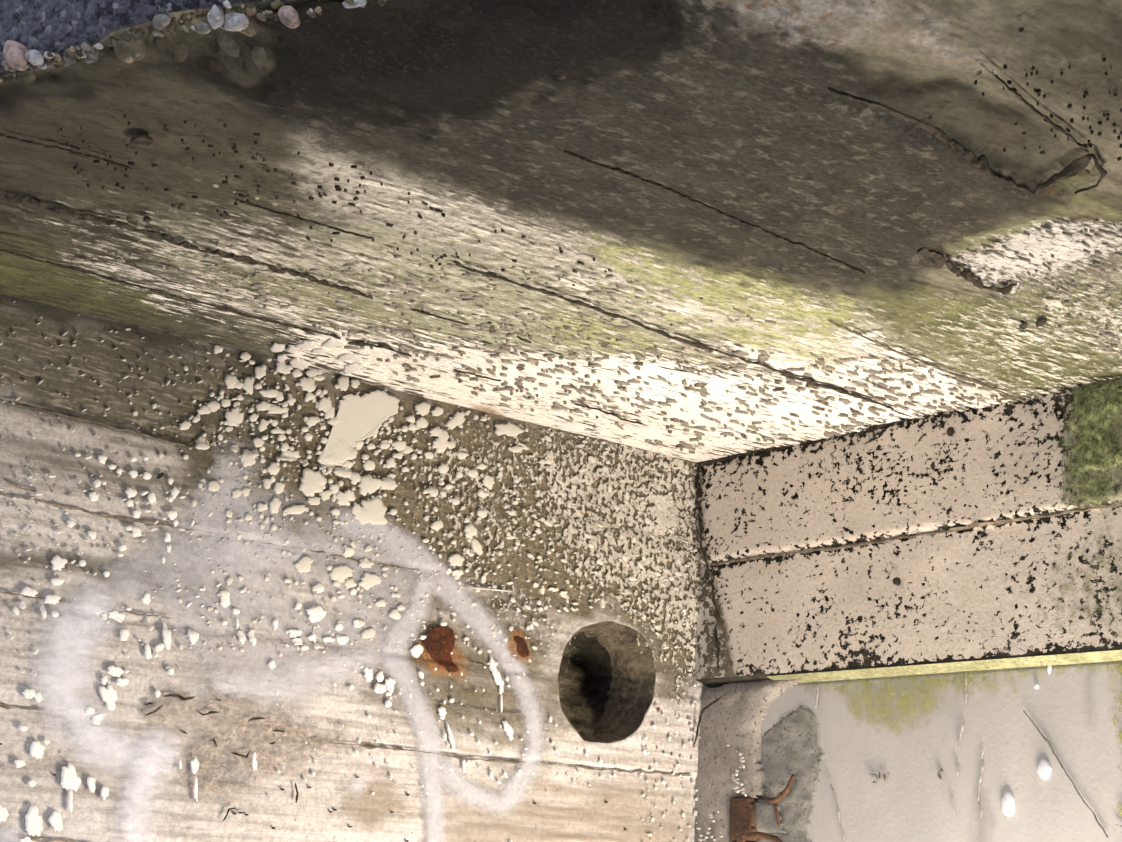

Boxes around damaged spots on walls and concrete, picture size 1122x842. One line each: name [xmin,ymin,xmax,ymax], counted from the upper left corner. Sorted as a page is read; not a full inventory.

spalling [974,64,1071,106]
damp [1004,14,1122,133]
spalling [1044,90,1122,161]
damp [0,0,1076,699]
damp [993,269,1122,367]
peeling [41,120,1122,709]
rust [417,626,466,678]
damp [404,598,530,746]
rust [509,630,530,660]
damp [496,624,564,728]